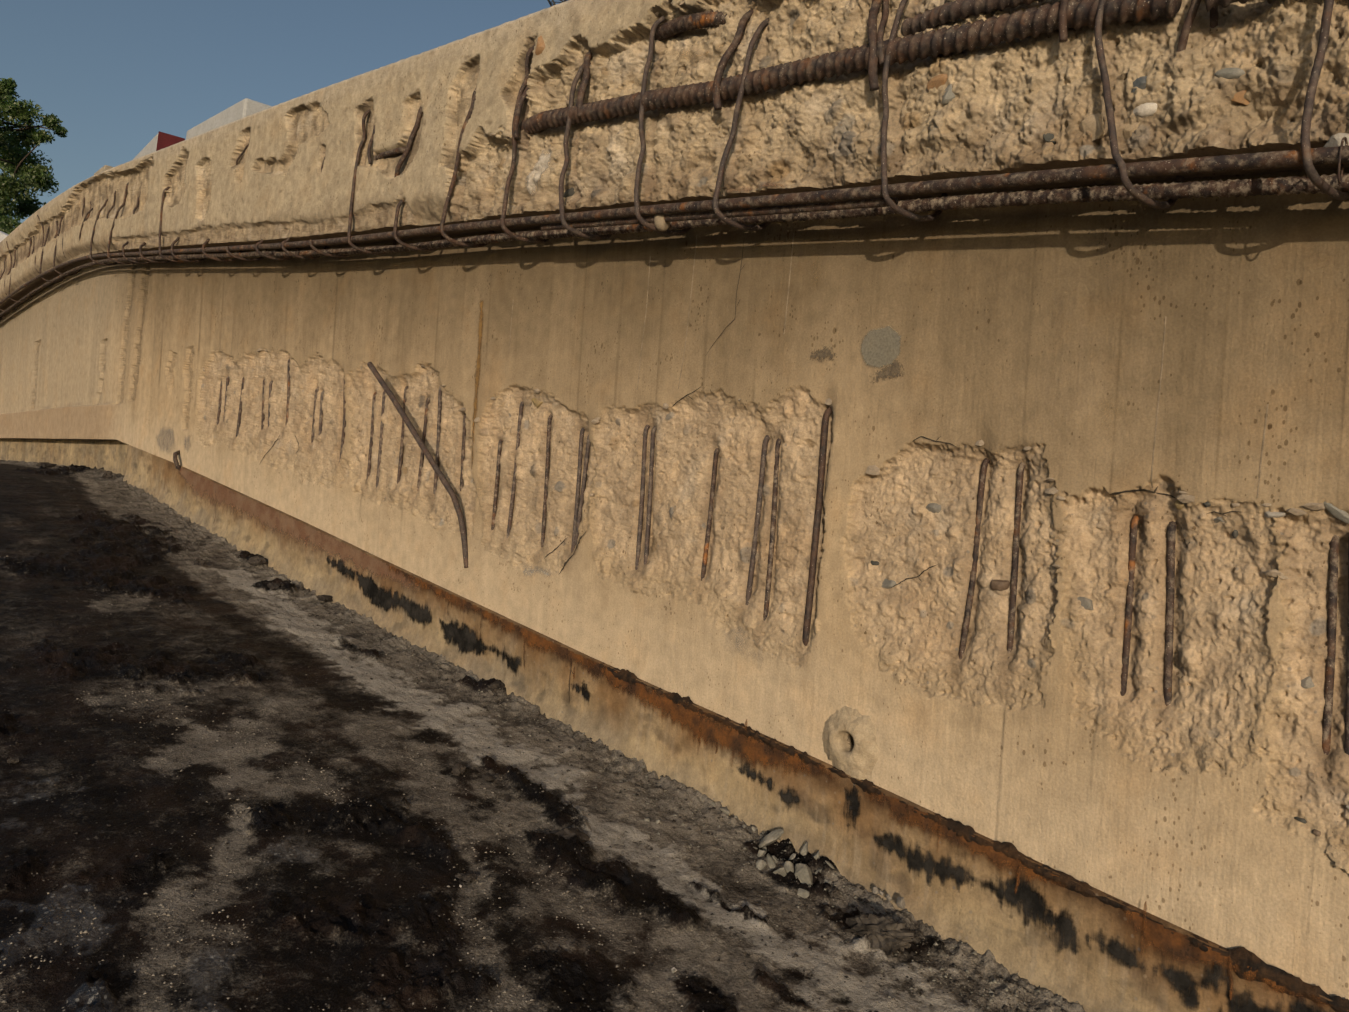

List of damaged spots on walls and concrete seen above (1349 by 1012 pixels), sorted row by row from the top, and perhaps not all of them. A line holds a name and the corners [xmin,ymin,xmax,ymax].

spalling [0,0,1349,410]
corrosion [471,301,483,469]
spalling [167,346,834,668]
corrosion [179,468,832,779]
spalling [840,440,1349,874]